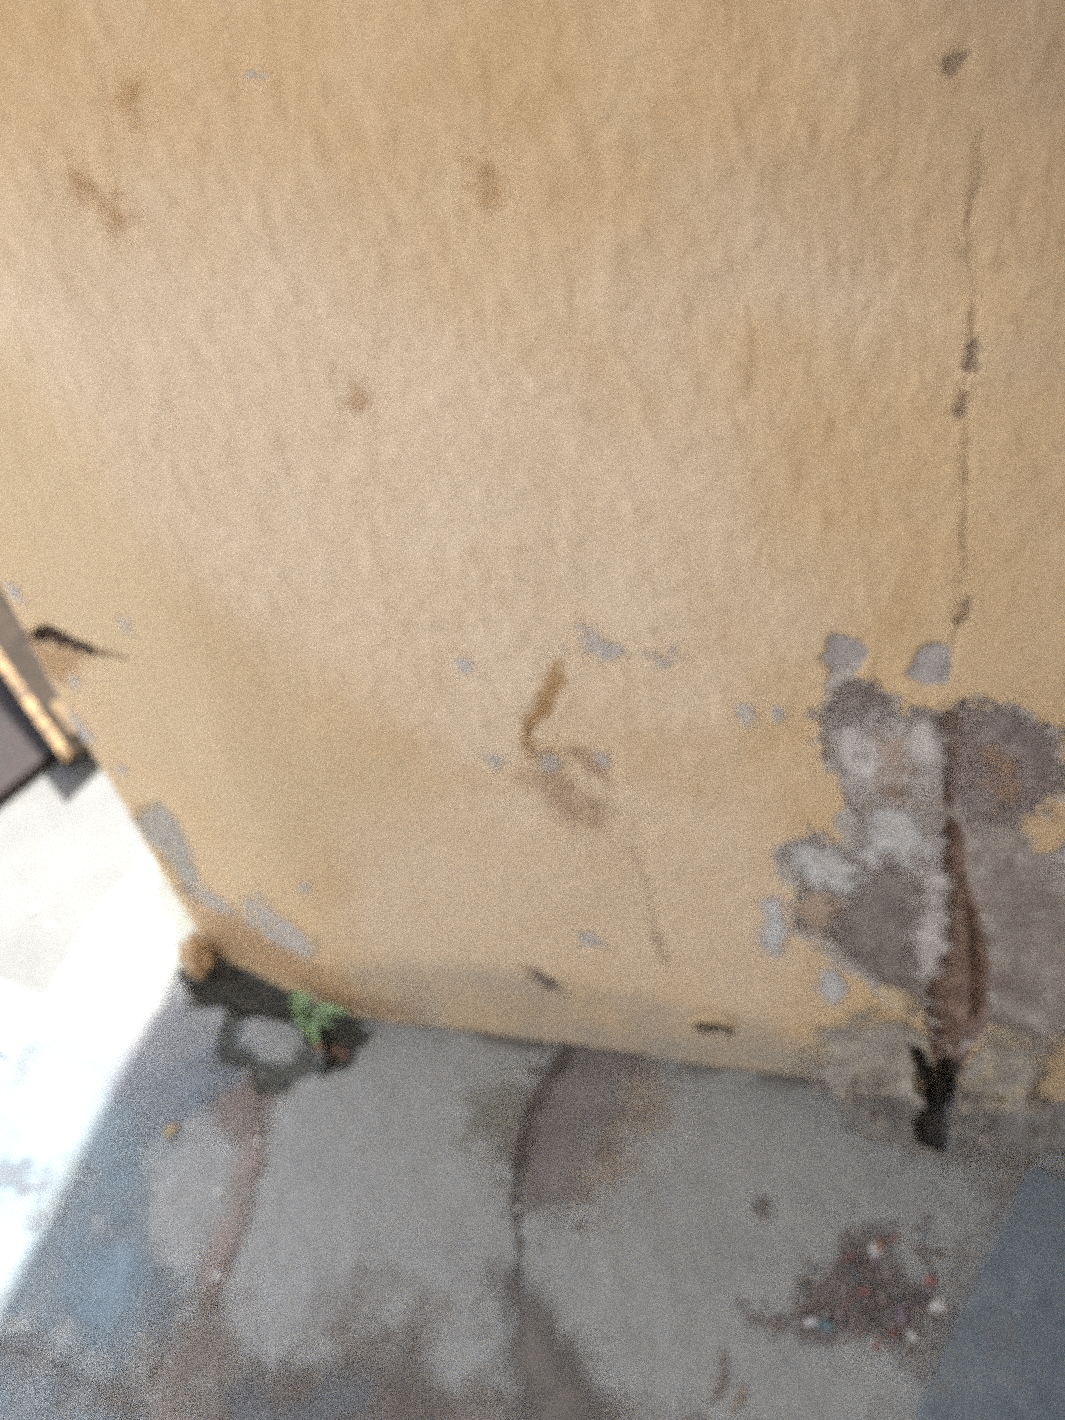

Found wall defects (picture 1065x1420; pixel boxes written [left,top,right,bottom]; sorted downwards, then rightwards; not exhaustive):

peeling [134,801,319,961]
rust [525,667,564,756]
spalling [752,634,1065,1174]
crack [907,709,995,1151]